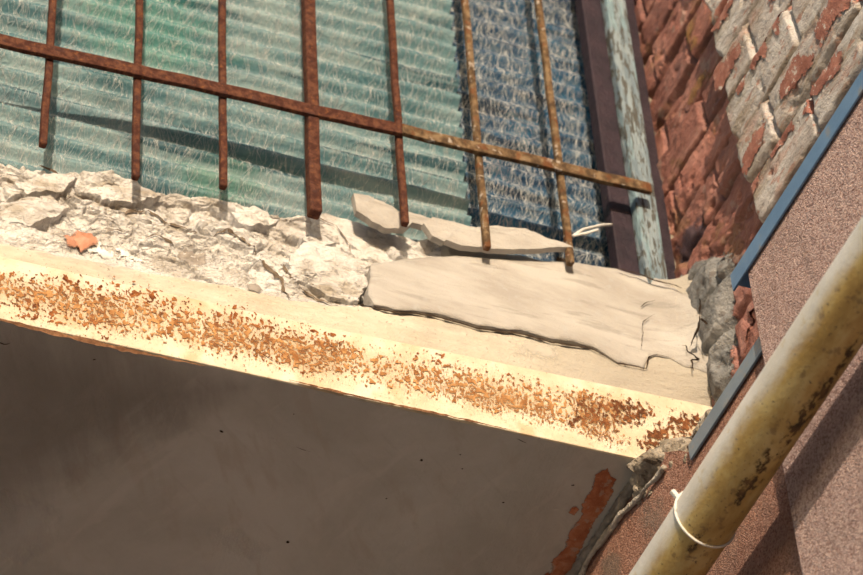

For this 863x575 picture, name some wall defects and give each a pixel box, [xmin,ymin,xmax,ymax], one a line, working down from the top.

peeling [711,0,733,32]
peeling [713,38,743,91]
peeling [736,0,792,95]
peeling [778,0,862,100]
peeling [740,51,842,194]
spalling [0,163,708,374]
crack [90,209,708,370]
corrosion [0,270,702,451]
peeling [545,468,616,575]